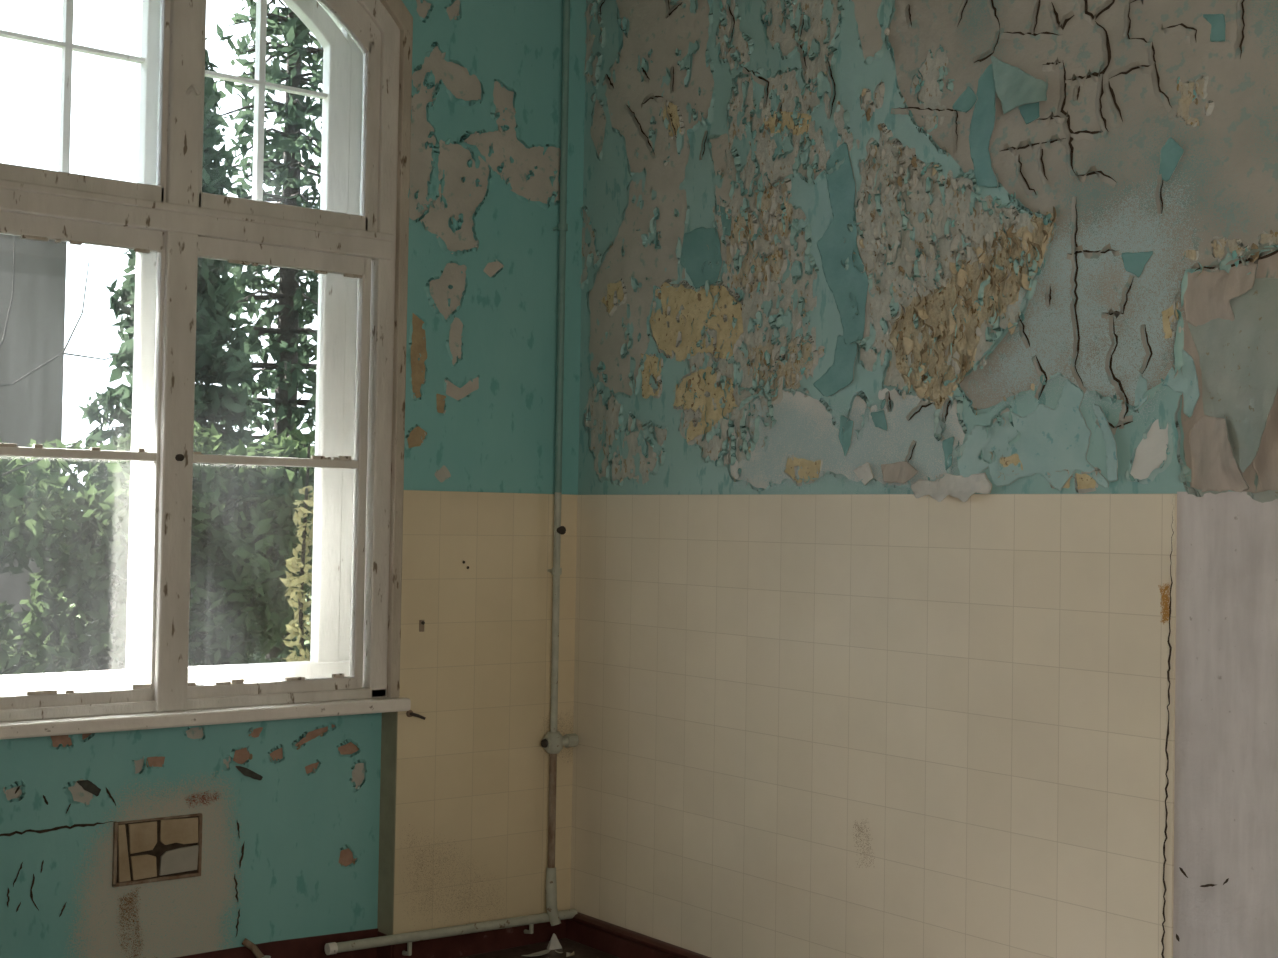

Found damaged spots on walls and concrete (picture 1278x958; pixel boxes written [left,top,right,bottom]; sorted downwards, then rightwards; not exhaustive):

crack [904,5,912,28]
crack [1234,0,1245,59]
crack [891,107,958,153]
peeling [408,42,561,417]
peeling [587,0,1278,503]
crack [954,0,1197,435]
spalling [405,424,428,451]
spalling [46,733,95,750]
spalling [222,721,367,793]
peeling [2,779,26,803]
peeling [63,779,101,807]
crack [0,786,116,917]